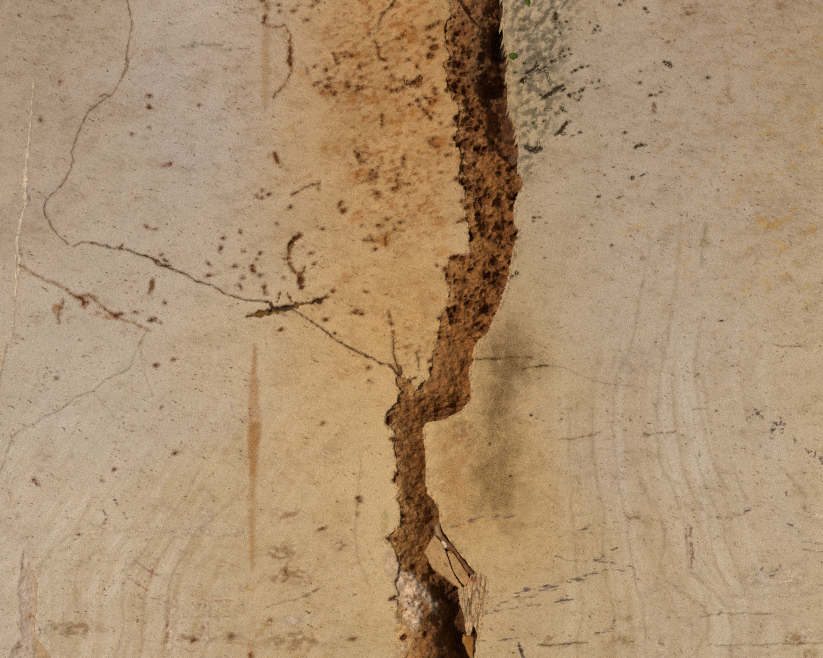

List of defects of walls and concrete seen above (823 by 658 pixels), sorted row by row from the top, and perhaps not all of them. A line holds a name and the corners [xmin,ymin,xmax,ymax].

spalling [384,21,481,124]
damp [512,0,568,148]
crack [43,1,270,303]
spalling [428,115,478,156]
spalling [455,177,483,223]
crack [20,265,149,331]
spalling [245,252,335,318]
spalling [284,233,316,290]
spalling [436,255,467,285]
damp [384,554,438,634]
peeling [424,535,469,588]